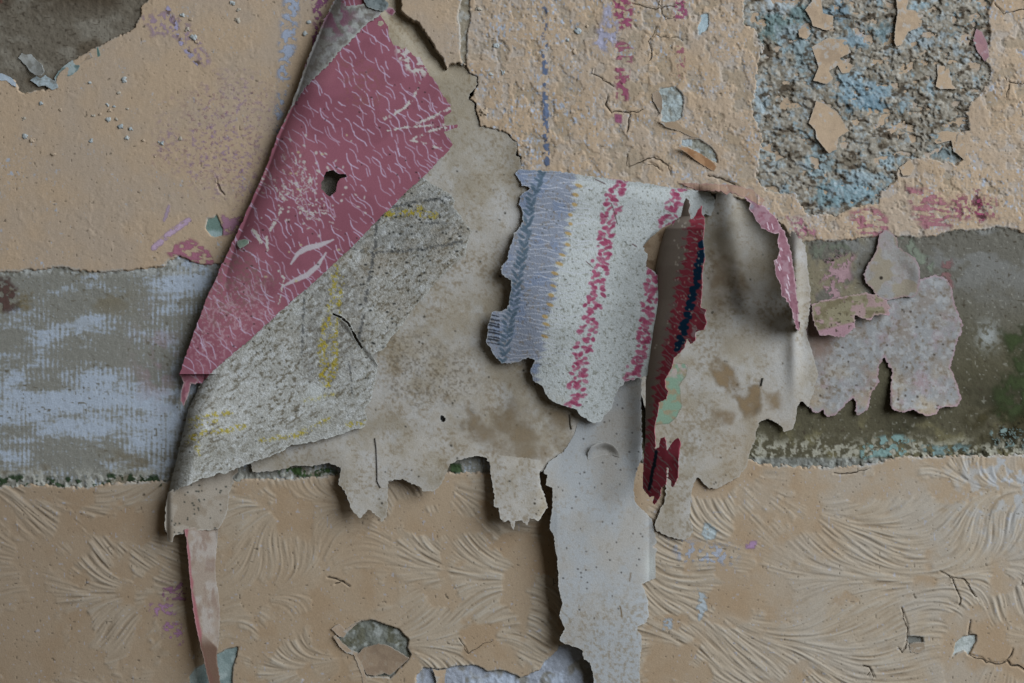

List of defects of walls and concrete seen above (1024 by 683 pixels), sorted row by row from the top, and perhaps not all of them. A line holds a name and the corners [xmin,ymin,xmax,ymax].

peeling [0,0,147,93]
peeling [458,0,470,65]
flaking render [743,0,993,217]
peeling [206,215,223,237]
peeling [0,257,221,489]
peeling [640,363,687,463]
peeling [748,227,1024,470]
peeling [233,463,341,482]
peeling [447,456,490,474]
peeling [332,620,410,683]
crack [941,571,1024,669]